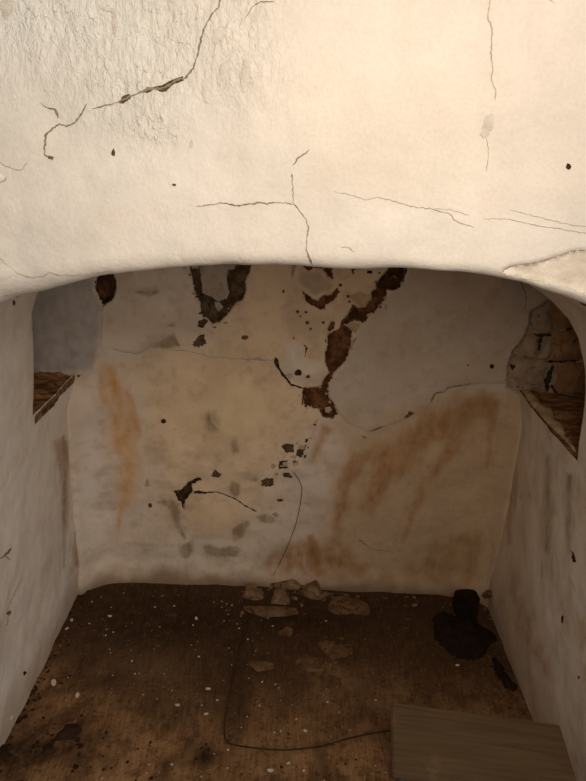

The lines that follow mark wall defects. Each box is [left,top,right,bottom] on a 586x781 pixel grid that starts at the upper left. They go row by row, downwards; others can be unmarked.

crack [40,0,220,160]
crack [487,0,496,100]
crack [196,149,313,265]
spalling [183,264,251,348]
spalling [291,265,333,280]
spalling [298,268,407,426]
spalling [501,249,586,306]
spalling [507,299,585,453]
corrosion [93,357,149,545]
spalling [261,438,312,487]